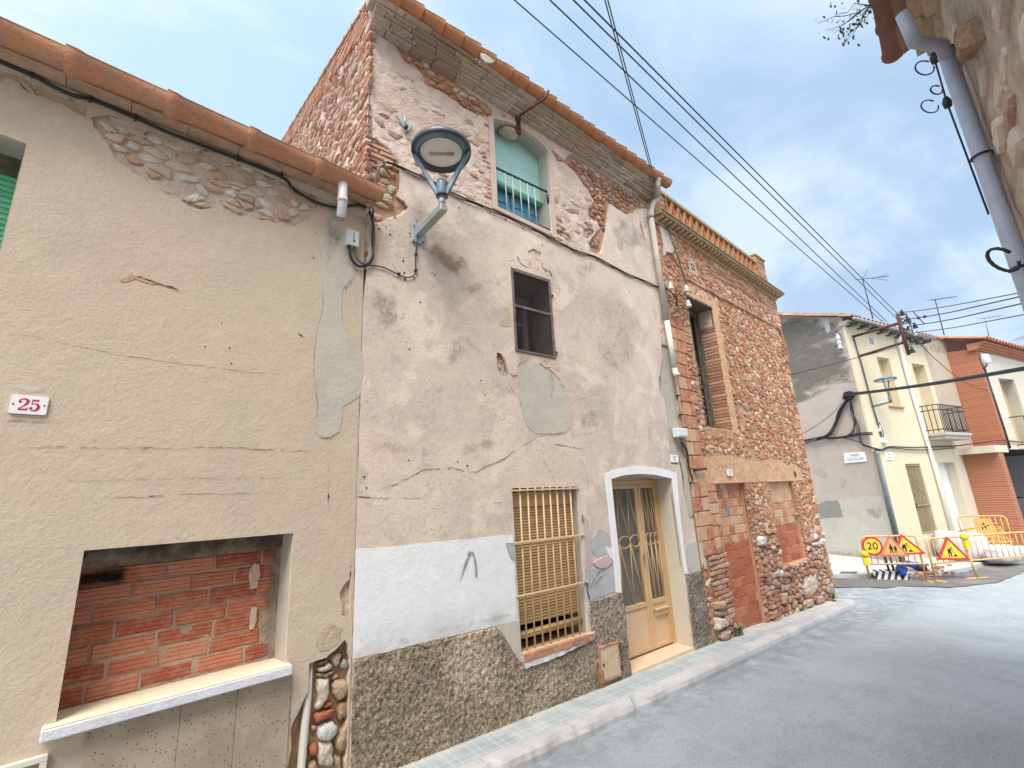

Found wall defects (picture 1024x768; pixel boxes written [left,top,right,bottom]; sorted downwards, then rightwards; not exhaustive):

flaking render [399,50,492,118]
flaking render [0,72,318,227]
flaking render [368,138,407,222]
flaking render [554,154,648,254]
spalling [120,273,180,291]
crack [12,281,352,451]
flaking render [497,354,508,376]
crack [357,361,604,499]
leakage [89,534,283,559]
spalling [287,642,348,768]